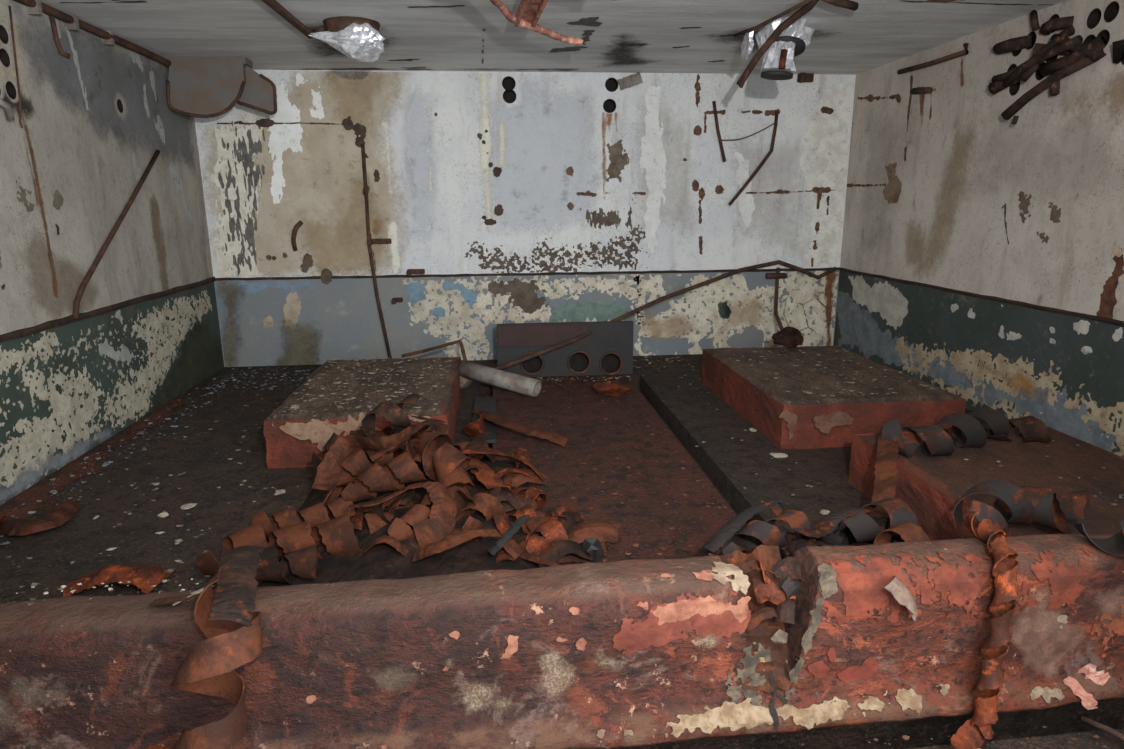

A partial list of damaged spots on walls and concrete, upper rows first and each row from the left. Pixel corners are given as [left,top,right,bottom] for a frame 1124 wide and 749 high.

corrosion [576,113,617,197]
peeling [399,82,1124,457]
corrosion [1096,248,1124,319]
peeling [0,290,310,518]
corrosion [63,564,176,597]
corrosion [581,538,605,563]